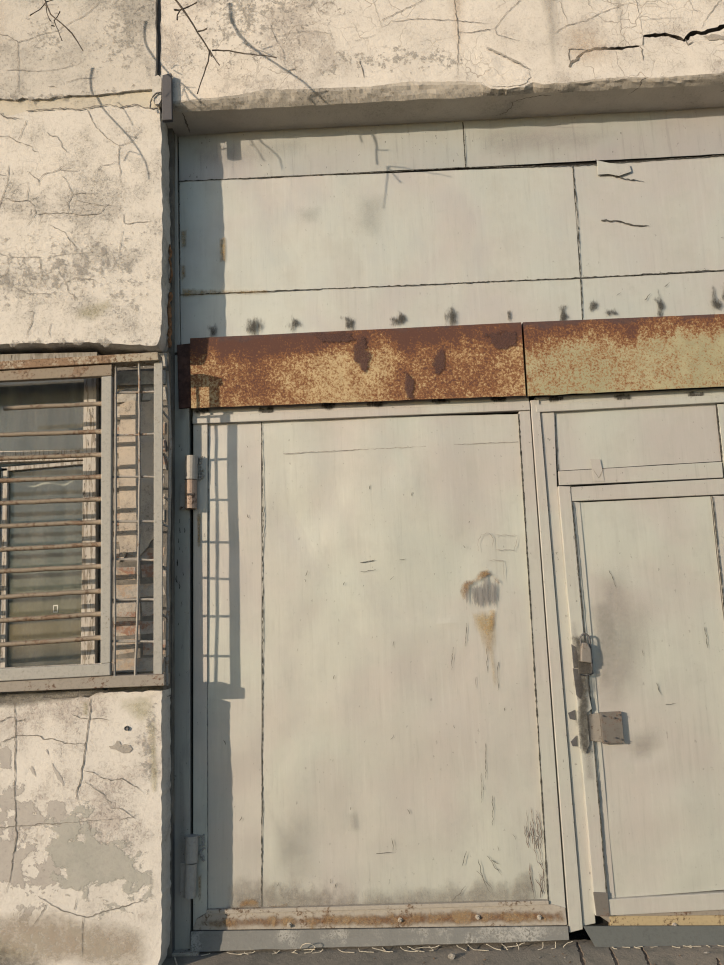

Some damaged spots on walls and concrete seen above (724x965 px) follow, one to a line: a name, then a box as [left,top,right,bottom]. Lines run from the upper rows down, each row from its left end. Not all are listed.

crack [354,0,529,76]
crack [553,0,724,95]
crack [0,2,156,332]
rust [314,331,371,372]
rust [404,372,414,399]
rust [432,350,445,375]
rust [485,330,517,350]
peeling [109,741,132,753]
crack [0,700,144,890]
peeling [0,766,152,960]
crack [32,896,142,958]
rust [210,904,562,928]